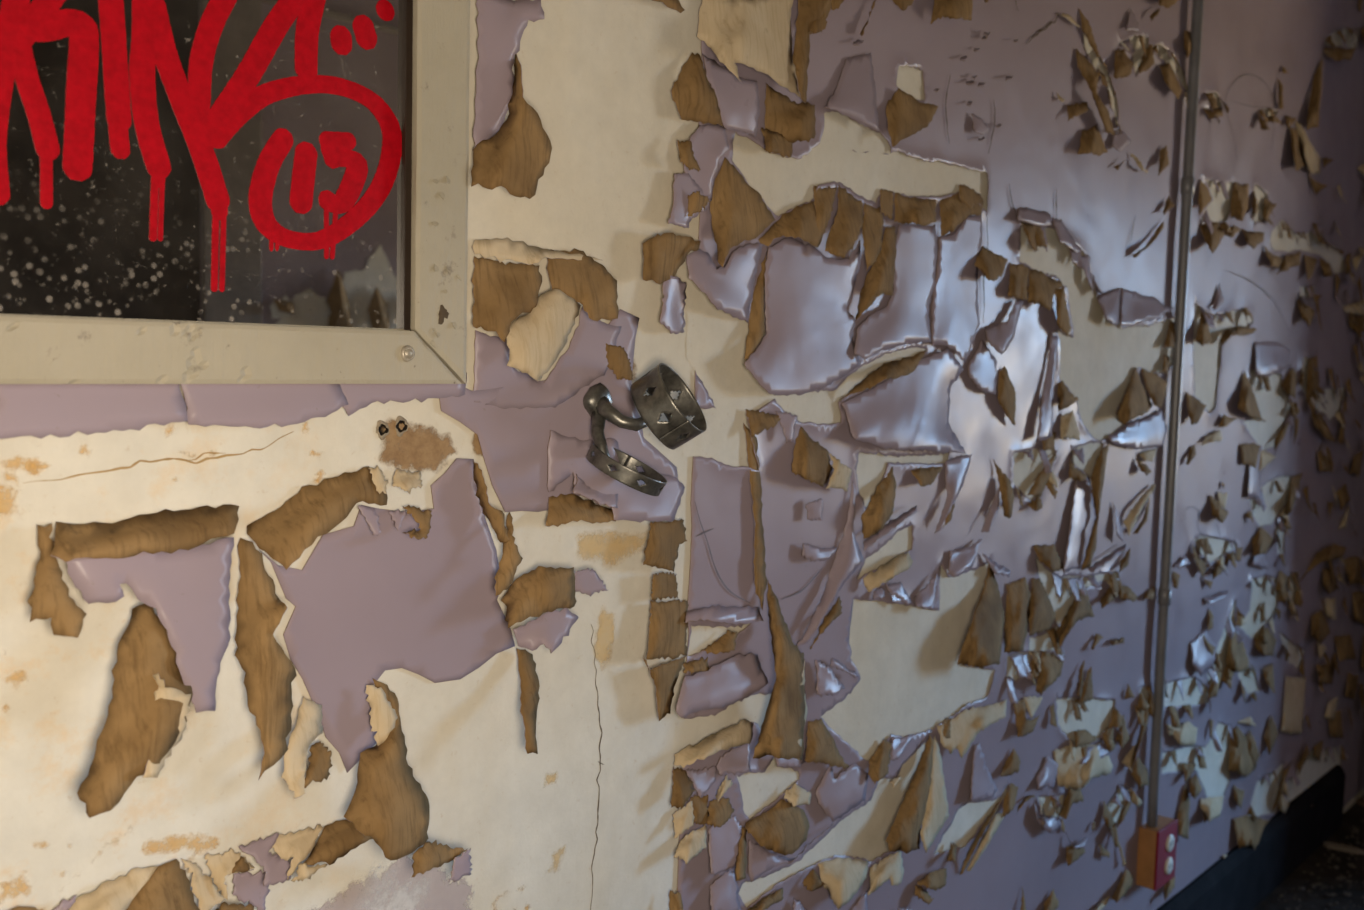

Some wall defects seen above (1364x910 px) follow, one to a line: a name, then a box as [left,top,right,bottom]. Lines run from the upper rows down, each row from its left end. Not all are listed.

peeling [471,0,552,199]
water stain [0,458,47,513]
peeling [27,466,432,818]
peeling [472,459,608,754]
peeling [545,0,1364,910]
water stain [147,837,217,852]